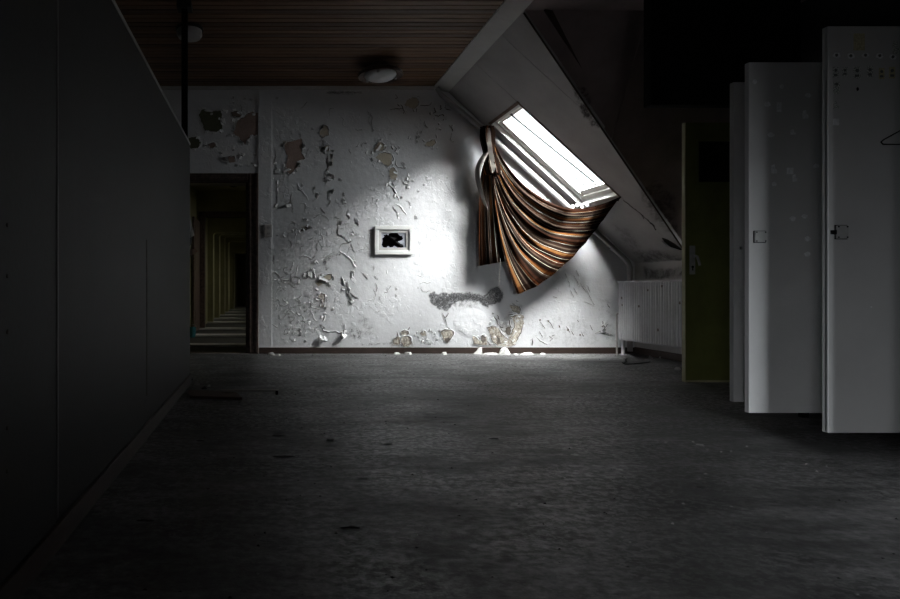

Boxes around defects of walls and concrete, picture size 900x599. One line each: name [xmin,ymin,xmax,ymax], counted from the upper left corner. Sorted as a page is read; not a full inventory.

peeling [188,105,258,167]
peeling [364,132,427,192]
peeling [272,125,407,343]
flaking render [392,313,455,355]